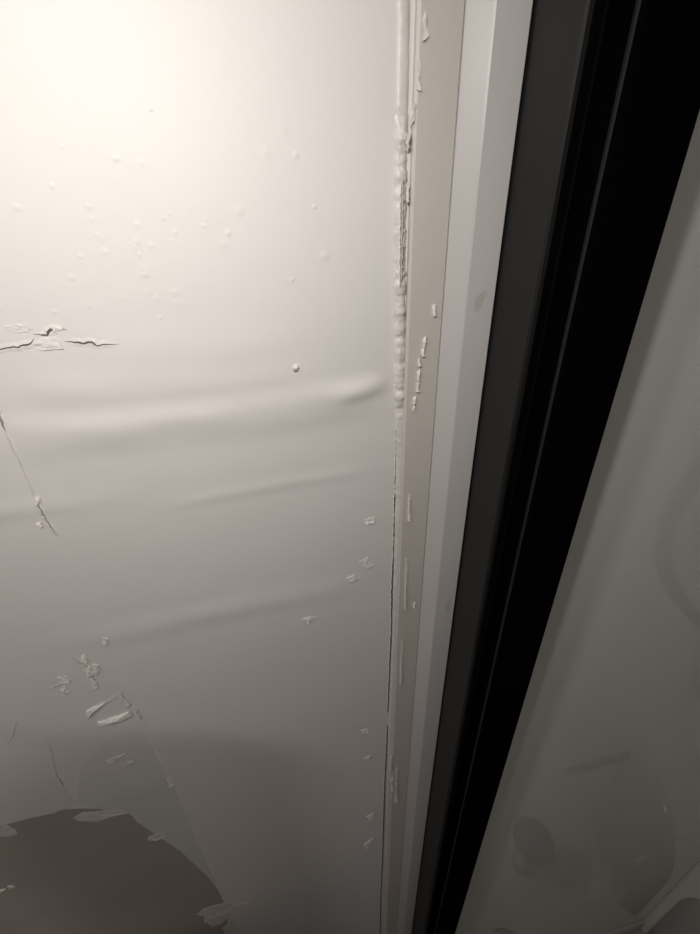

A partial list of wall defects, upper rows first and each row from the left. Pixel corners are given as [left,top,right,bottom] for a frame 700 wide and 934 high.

crack [0,324,119,354]
crack [0,407,60,537]
peeling [0,692,248,934]